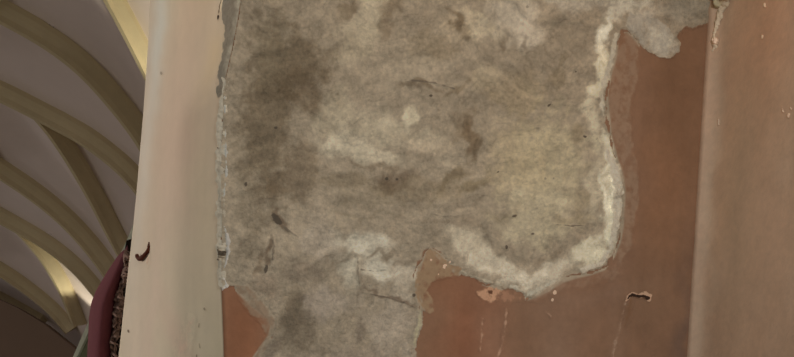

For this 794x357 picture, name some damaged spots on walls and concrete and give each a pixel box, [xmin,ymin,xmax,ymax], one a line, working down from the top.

spalling [215,0,730,357]